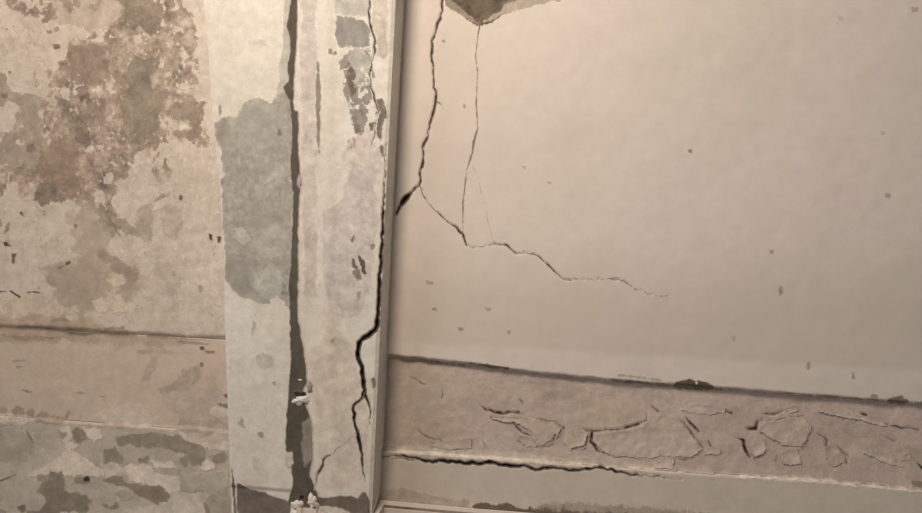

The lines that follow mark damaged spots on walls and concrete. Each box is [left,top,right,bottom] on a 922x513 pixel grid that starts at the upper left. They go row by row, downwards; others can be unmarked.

spalling [445,0,560,26]
water stain [0,0,210,380]
peeling [0,0,388,513]
crack [315,0,711,484]
peeling [398,403,725,472]
peeling [747,406,811,465]
crack [726,409,848,464]
crack [860,413,919,440]
peeling [737,475,922,493]